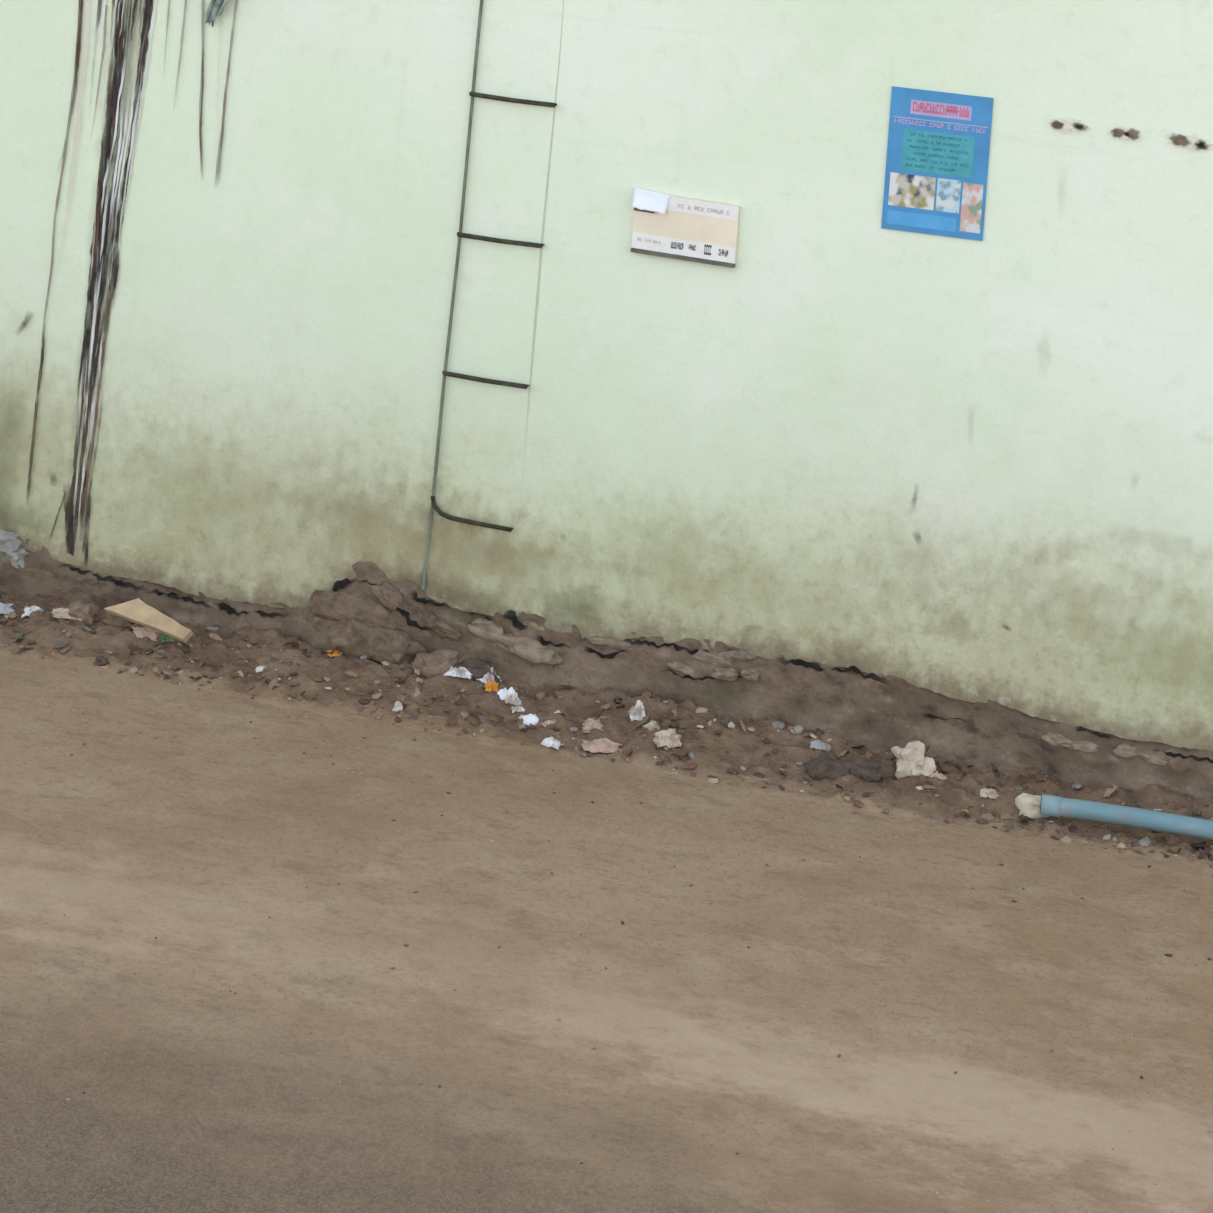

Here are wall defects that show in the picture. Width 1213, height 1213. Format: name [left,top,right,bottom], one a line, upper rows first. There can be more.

spalling [1051,121,1086,132]
spalling [1111,128,1139,140]
spalling [1170,135,1207,149]
leakage [27,332,45,495]